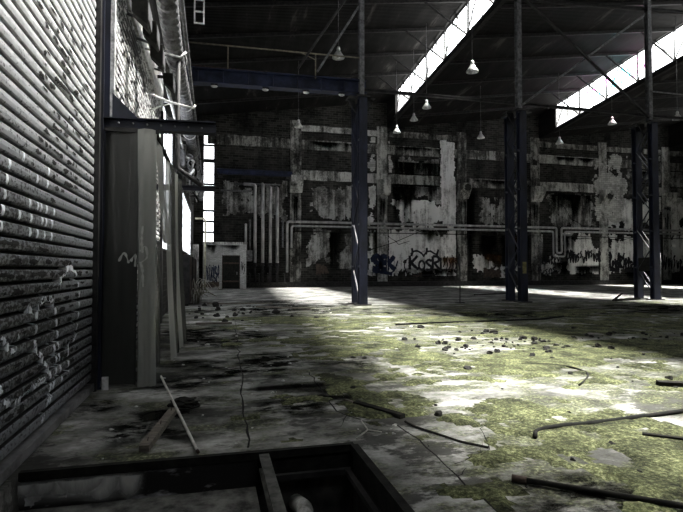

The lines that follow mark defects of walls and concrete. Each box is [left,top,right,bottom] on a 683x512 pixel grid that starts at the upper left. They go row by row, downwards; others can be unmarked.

peeling [291,228,352,275]
peeling [310,186,352,222]
peeling [368,185,376,276]
peeling [388,140,471,276]
peeling [472,254,505,278]
peeling [541,154,633,275]
crack [156,321,390,448]
crack [392,425,490,486]